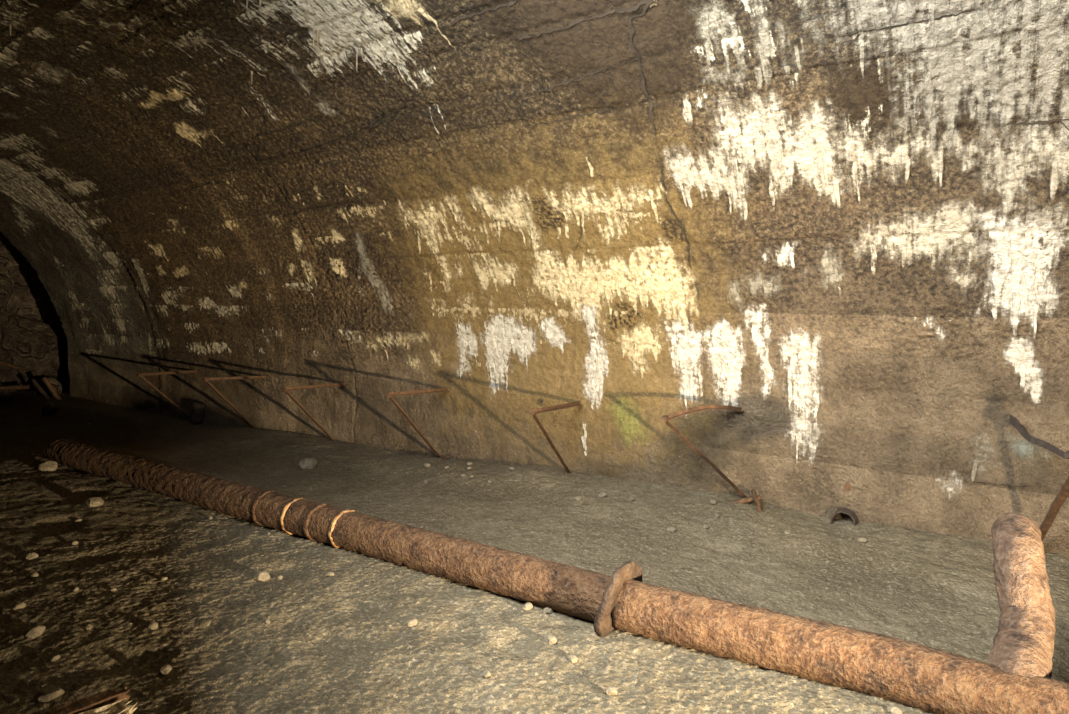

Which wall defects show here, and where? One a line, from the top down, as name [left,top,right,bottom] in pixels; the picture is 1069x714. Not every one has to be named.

damp [250,0,455,87]
damp [399,0,1069,460]
damp [940,436,993,493]